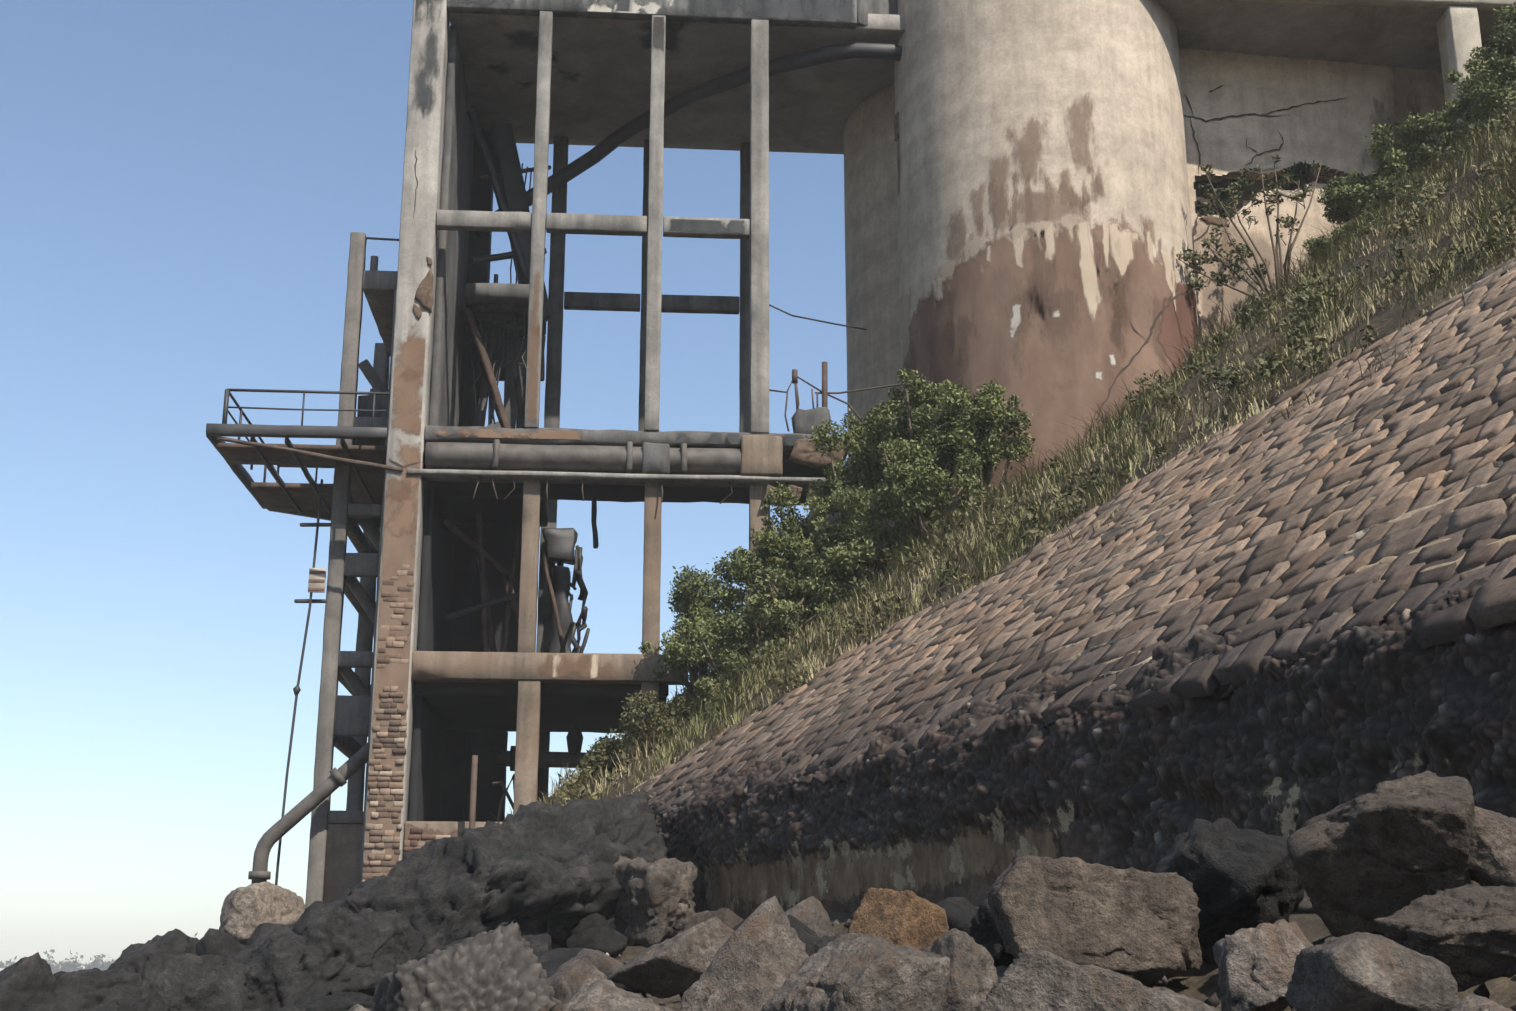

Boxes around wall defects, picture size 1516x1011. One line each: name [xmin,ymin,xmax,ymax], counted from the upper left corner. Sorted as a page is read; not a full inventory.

leakage [617,0,630,11]
peeling [588,0,674,14]
leakage [415,0,514,114]
crack [1183,85,1351,175]
spalling [1194,165,1372,227]
spalling [413,257,434,320]
crack [1091,216,1210,429]